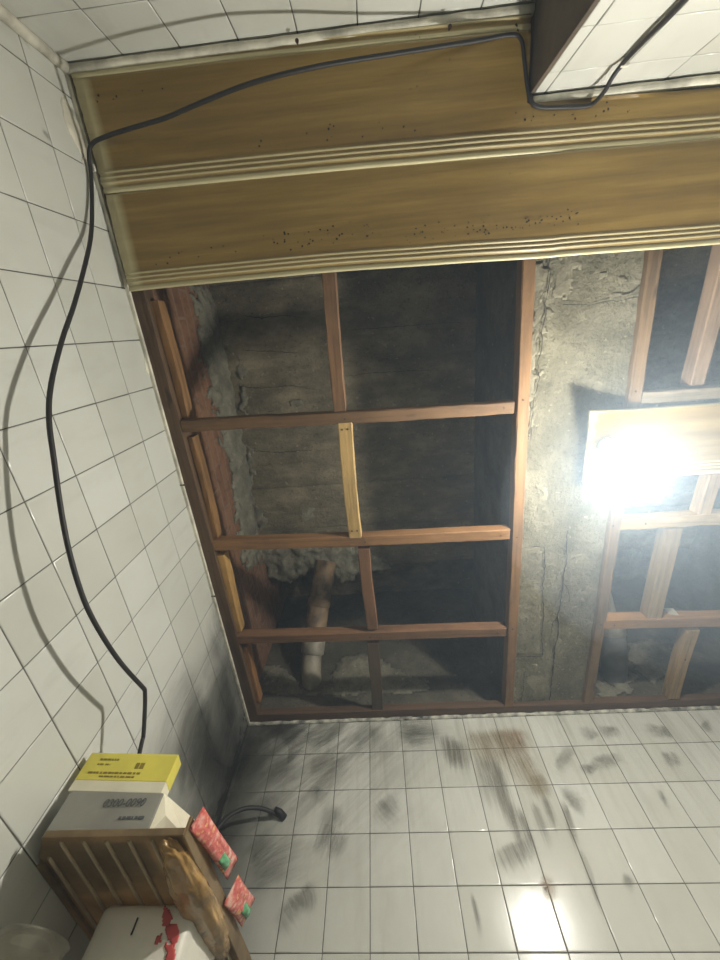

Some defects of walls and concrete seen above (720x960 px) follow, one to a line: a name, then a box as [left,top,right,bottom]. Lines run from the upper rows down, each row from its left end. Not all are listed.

flaking render [189,284,238,417]
flaking render [217,429,260,535]
crack [521,532,570,701]